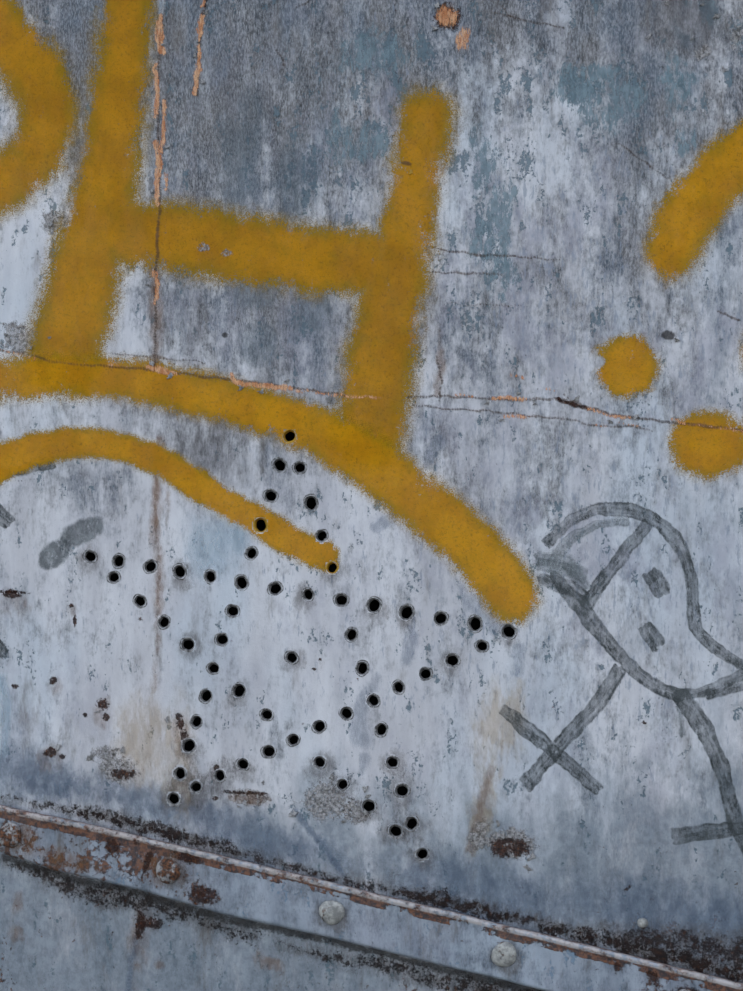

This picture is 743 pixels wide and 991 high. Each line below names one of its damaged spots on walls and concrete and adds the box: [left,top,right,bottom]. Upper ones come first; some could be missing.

peeling [431,0,469,50]
crack [0,323,373,403]
crack [408,363,743,432]
rust [1,795,743,991]